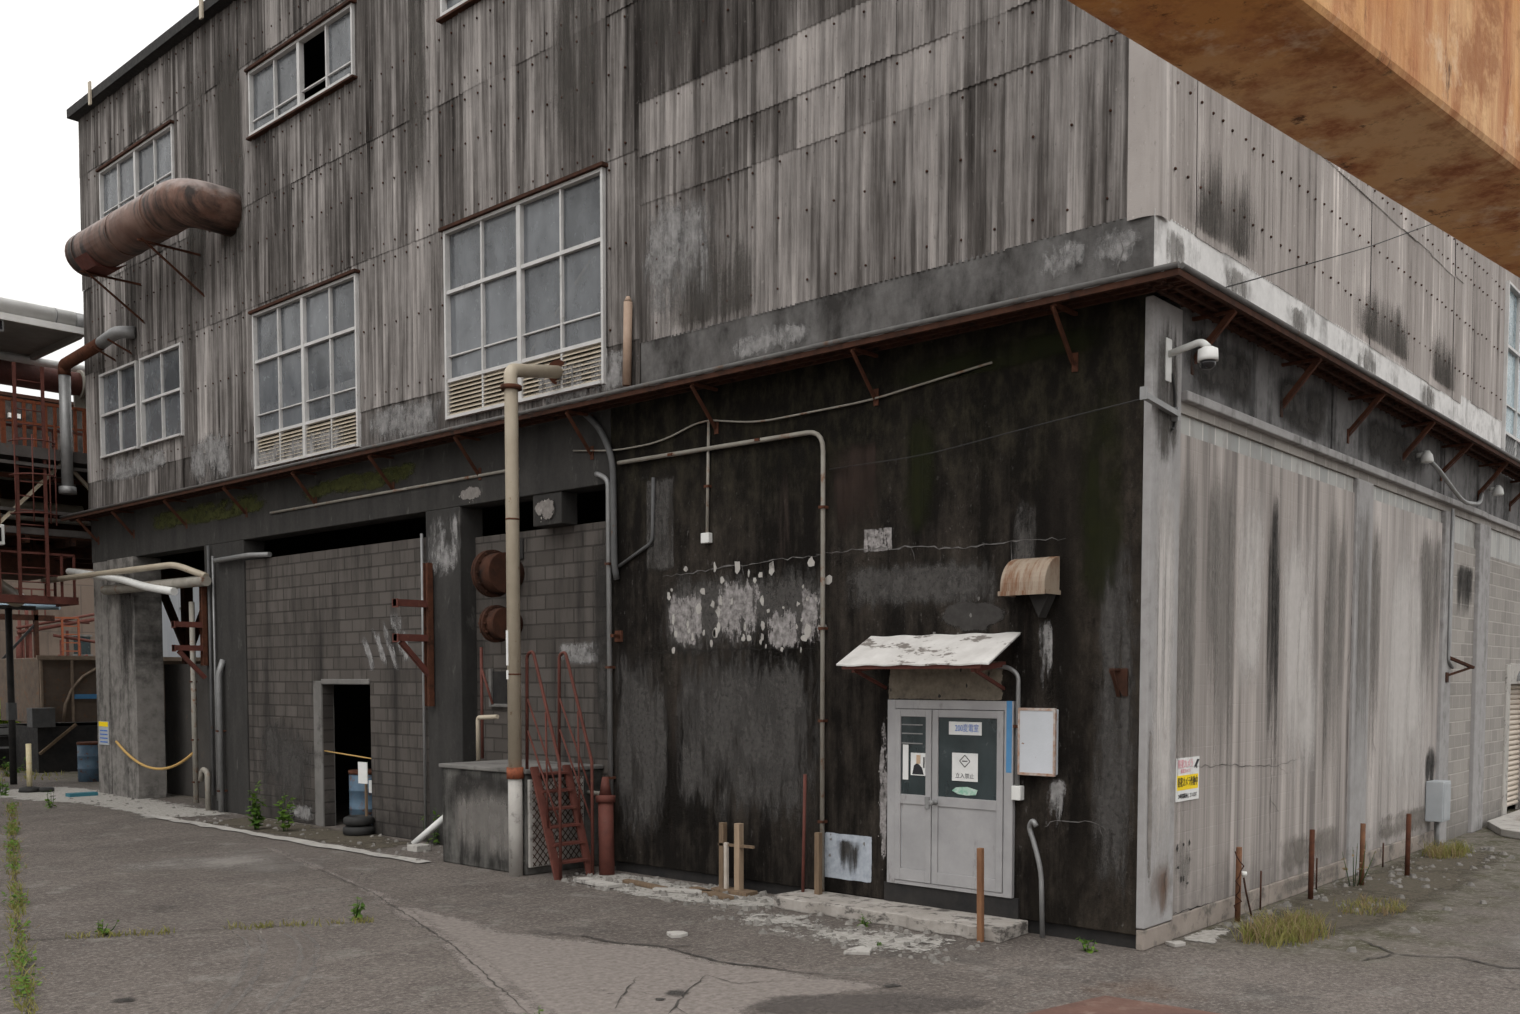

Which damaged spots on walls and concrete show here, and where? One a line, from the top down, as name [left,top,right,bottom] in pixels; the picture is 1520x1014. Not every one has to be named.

water stain [1167,231,1185,263]
water stain [1190,167,1254,298]
water stain [1294,308,1307,332]
water stain [1359,304,1406,373]
water stain [1423,343,1454,407]
water stain [1366,421,1426,473]
peeling [666,556,832,654]
water stain [1458,567,1472,605]
water stain [560,550,820,834]
water stain [1093,490,1440,883]